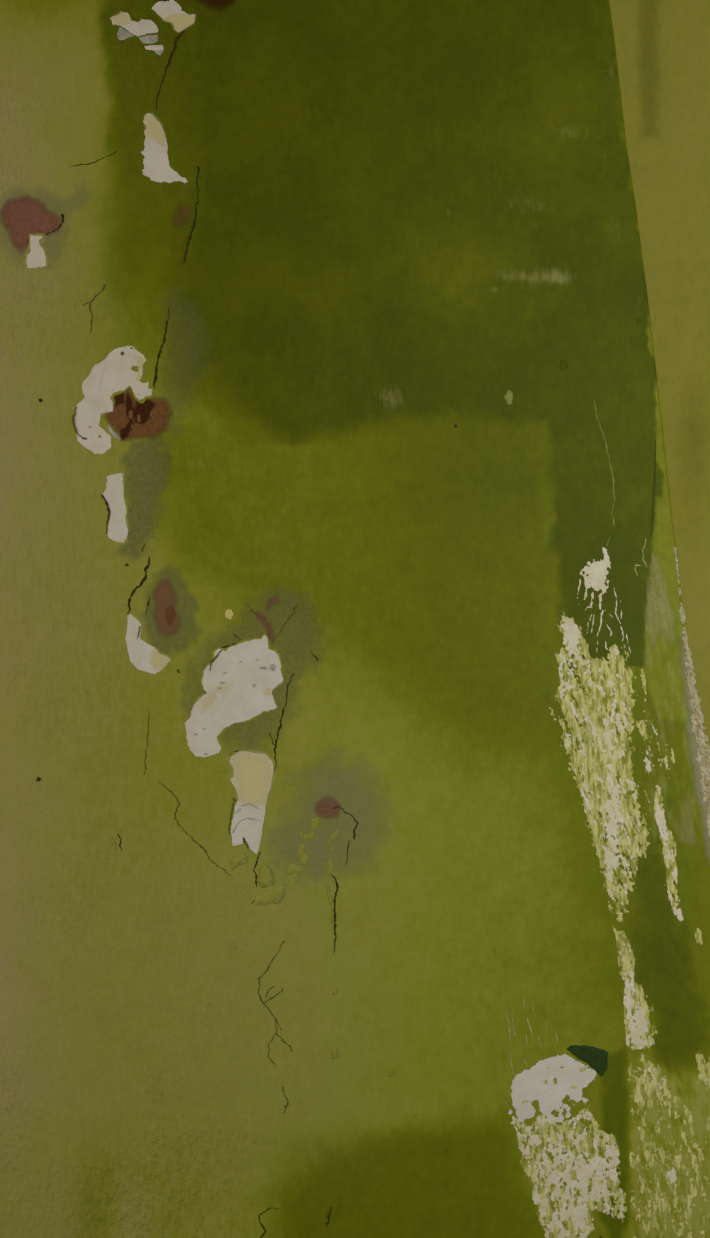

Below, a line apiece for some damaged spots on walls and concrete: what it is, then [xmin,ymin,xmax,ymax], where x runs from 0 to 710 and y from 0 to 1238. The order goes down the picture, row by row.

peeling [108,0,198,55]
peeling [139,111,190,187]
rust [2,198,60,250]
crack [179,166,200,264]
peeling [69,342,155,458]
rust [106,390,171,439]
peeling [99,470,131,545]
leakage [126,445,165,551]
peeling [182,631,286,859]
peeling [508,547,710,1238]
crack [258,941,293,1113]
crack [258,1208,277,1238]